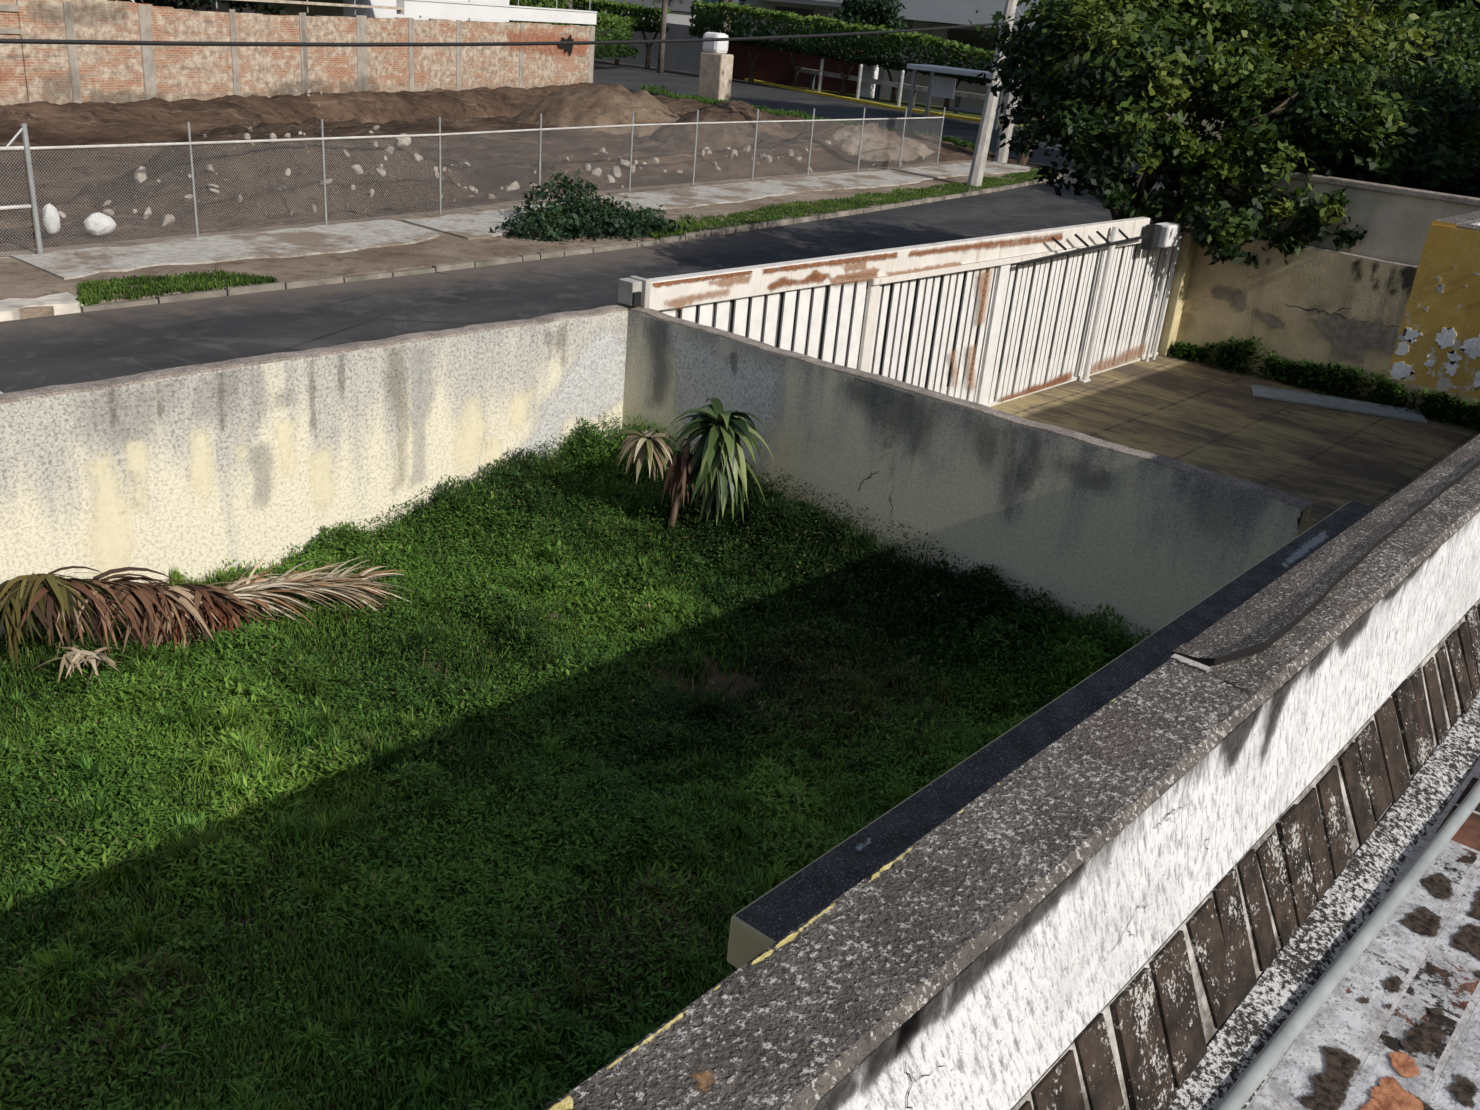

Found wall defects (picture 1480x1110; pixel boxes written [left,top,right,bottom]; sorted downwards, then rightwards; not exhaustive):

corrosion [653,234,1063,308]
corrosion [979,270,992,322]
corrosion [952,346,976,388]
flaking render [1310,314,1480,391]
water stain [456,401,501,470]
water stain [90,442,147,581]
peeling [1400,873,1480,979]
peeling [1359,975,1403,1009]
peeling [1298,1007,1447,1110]
peeling [1448,1074,1479,1108]